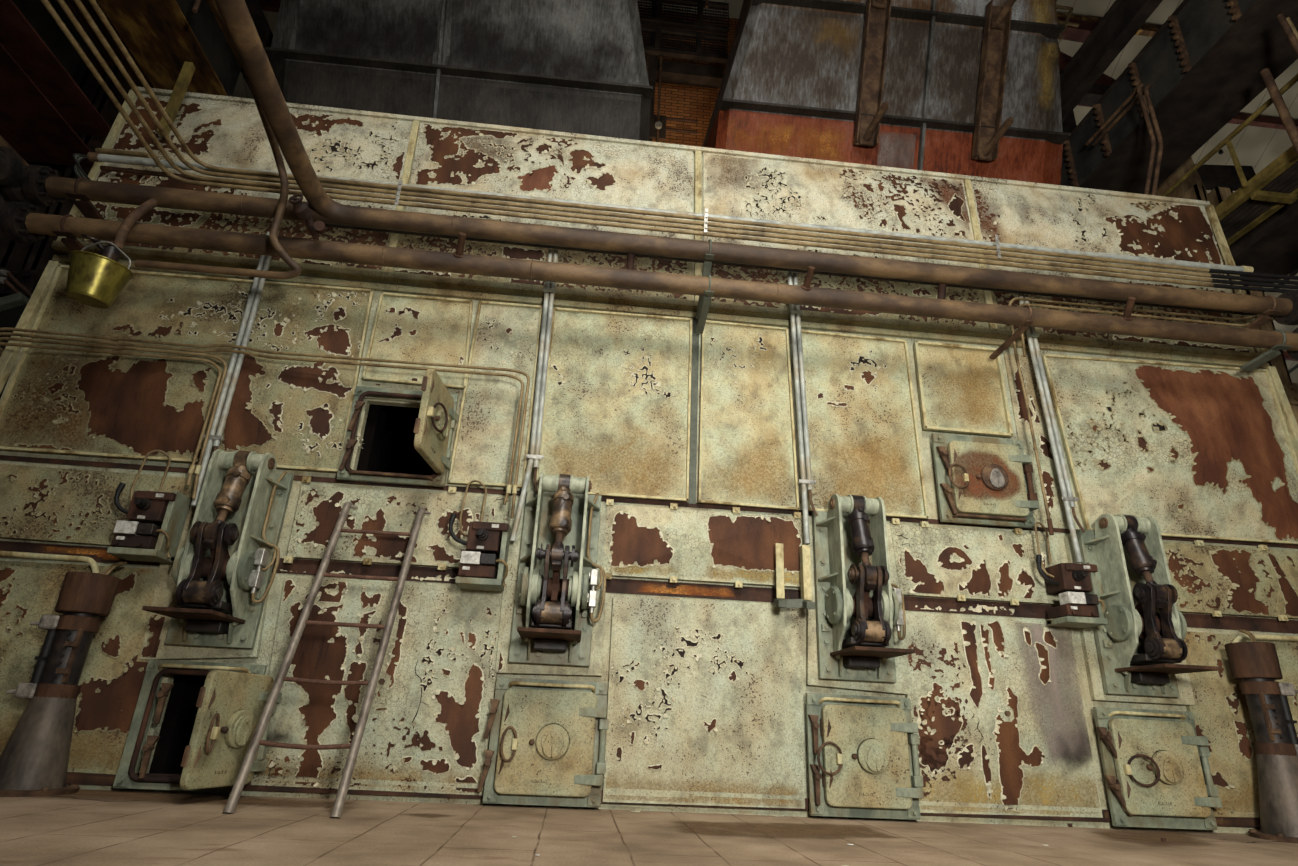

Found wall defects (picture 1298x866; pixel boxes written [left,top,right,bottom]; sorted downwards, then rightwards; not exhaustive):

peeling [392,123,518,186]
peeling [517,142,616,193]
peeling [1101,204,1223,264]
peeling [74,355,212,459]
peeling [220,306,353,452]
peeling [297,490,496,581]
peeling [608,511,674,568]
peeling [705,515,802,574]
corrosion [955,452,1019,499]
peeling [1134,364,1298,617]
peeling [283,571,384,787]
peeling [898,534,1047,812]